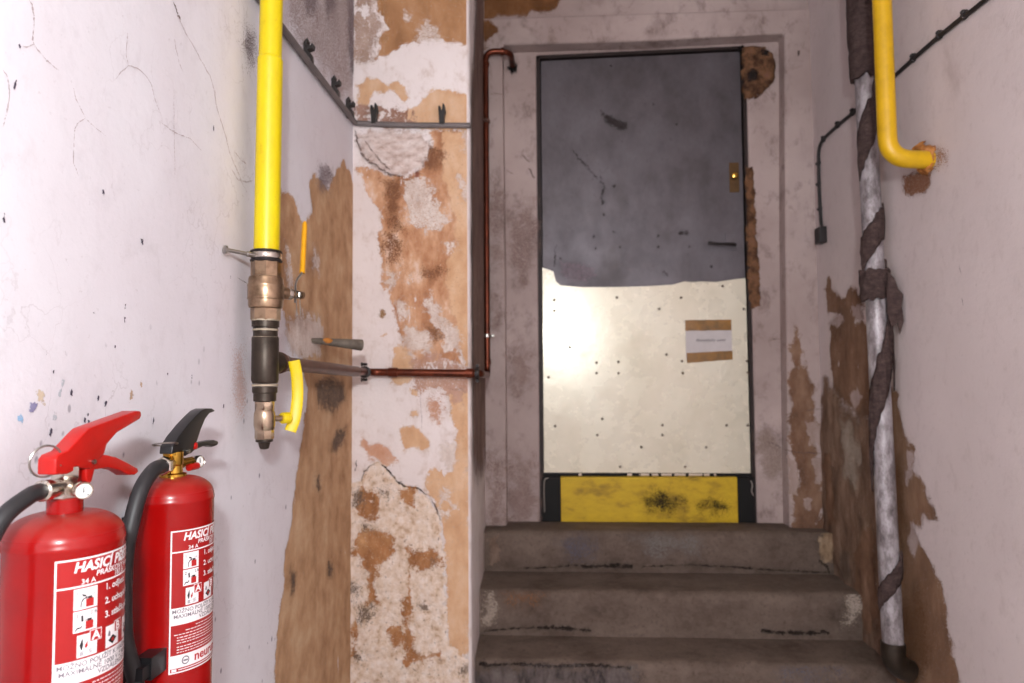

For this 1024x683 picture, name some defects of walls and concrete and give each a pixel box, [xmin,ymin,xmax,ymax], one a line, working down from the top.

crack [24,2,58,70]
crack [119,34,202,153]
crack [174,4,251,192]
peeling [374,0,466,60]
flaking render [738,44,776,99]
flaking render [912,141,936,176]
flaking render [744,167,761,309]
peeling [273,77,469,683]
peeling [786,323,834,566]
peeling [823,276,869,418]
peeling [891,387,961,683]